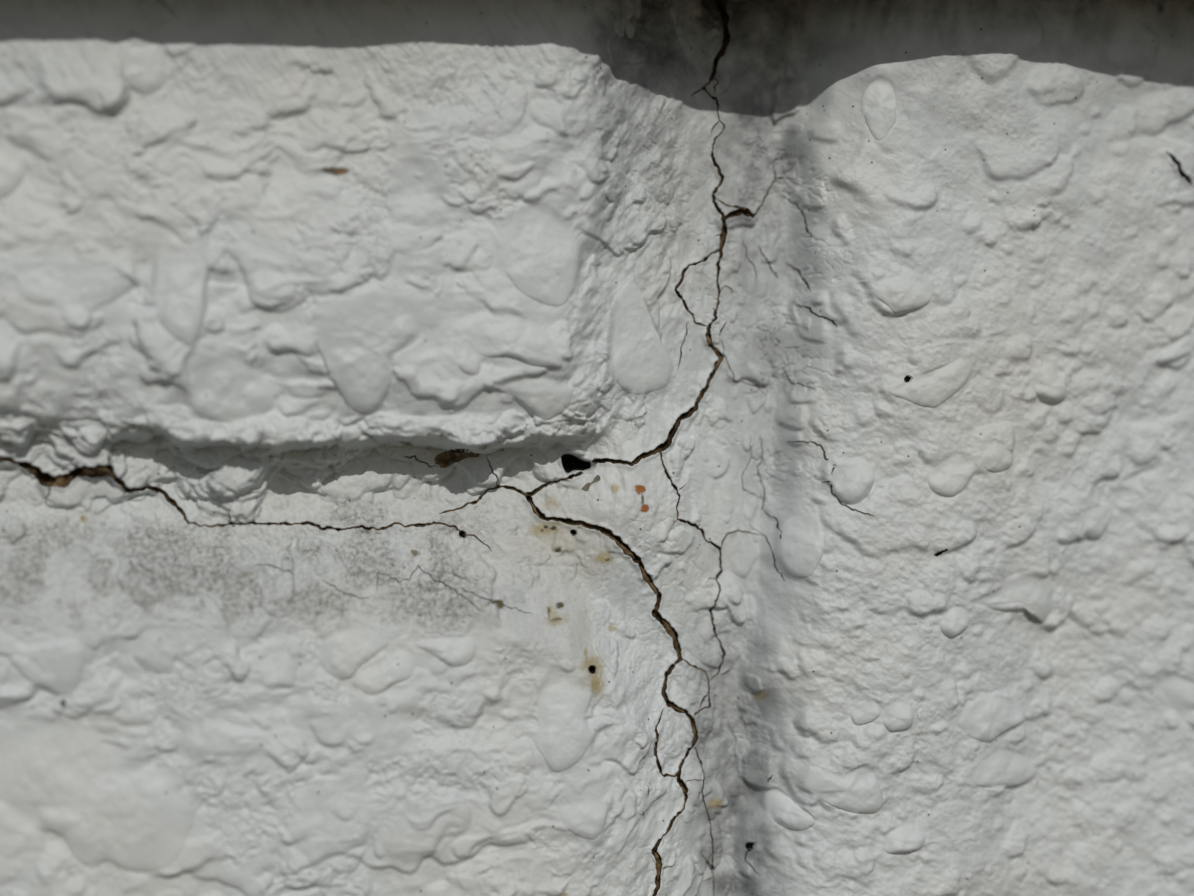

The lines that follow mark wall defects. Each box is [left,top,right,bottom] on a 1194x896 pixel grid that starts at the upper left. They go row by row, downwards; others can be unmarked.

crack [0,0,873,896]
crack [1166,152,1194,186]